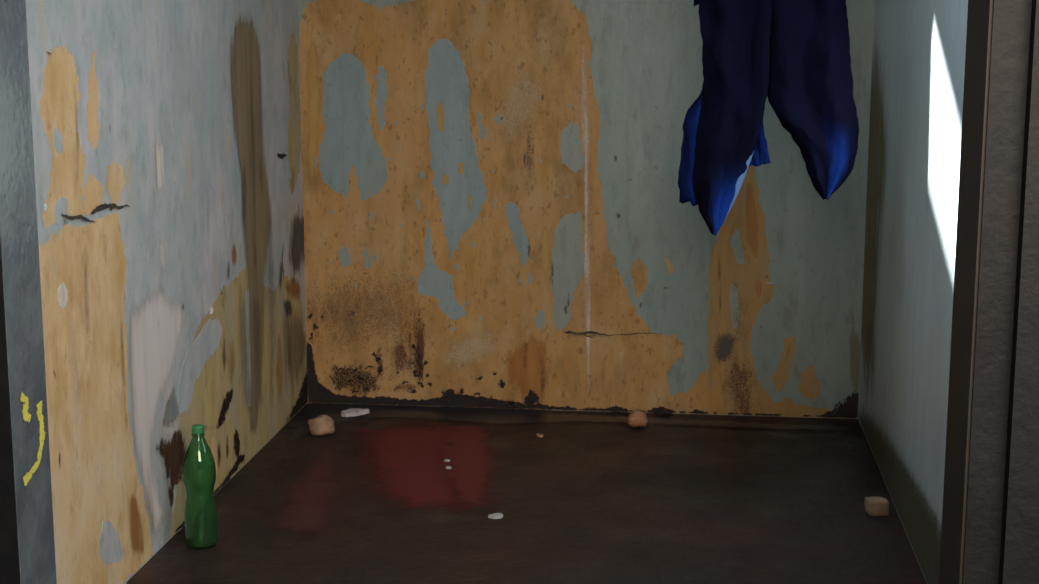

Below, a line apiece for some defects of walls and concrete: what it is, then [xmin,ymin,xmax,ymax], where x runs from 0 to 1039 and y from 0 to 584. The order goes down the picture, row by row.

peeling [39,45,153,584]
peeling [172,0,841,536]
leakage [204,13,942,584]